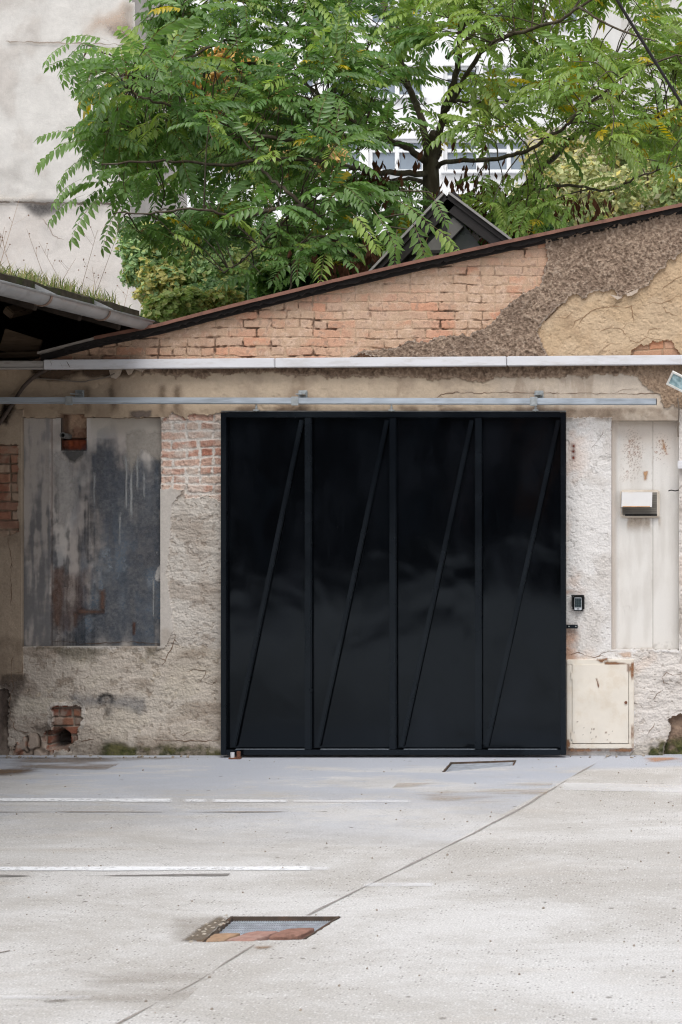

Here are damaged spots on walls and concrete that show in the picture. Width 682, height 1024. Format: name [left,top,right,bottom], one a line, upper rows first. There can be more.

flaking render [33,244,548,379]
crack [551,276,682,349]
flaking render [631,339,680,355]
flaking render [0,444,19,537]
flaking render [161,413,221,501]
leakage [51,431,162,646]
corrosion [597,652,634,678]
spalling [13,704,83,755]
corrosion [567,728,633,752]
flaking render [664,713,682,754]